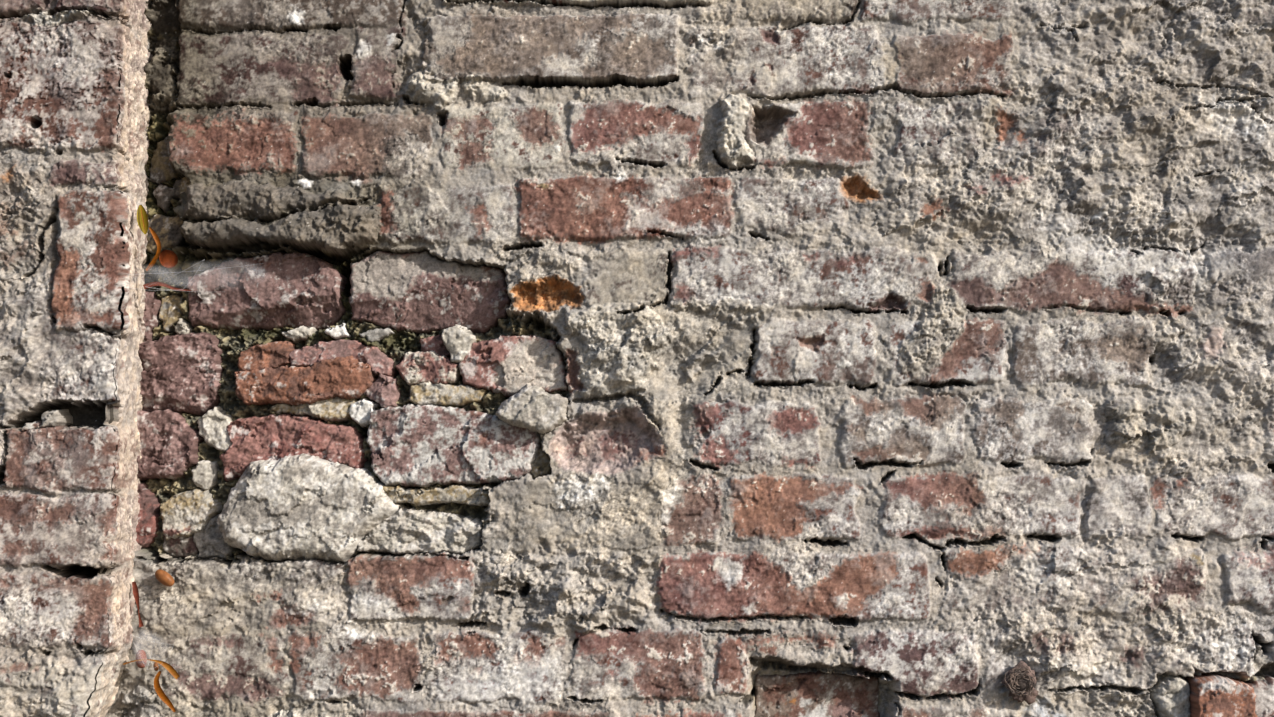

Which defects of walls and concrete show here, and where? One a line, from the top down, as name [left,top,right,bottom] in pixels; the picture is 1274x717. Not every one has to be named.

peeling [435,5,680,87]
spalling [757,26,782,46]
peeling [895,27,1034,150]
peeling [0,68,129,335]
crack [616,251,675,315]
peeling [134,50,1197,717]
crack [704,328,759,396]
peeling [98,425,120,464]
peeling [0,428,118,645]
spalling [1117,640,1274,717]